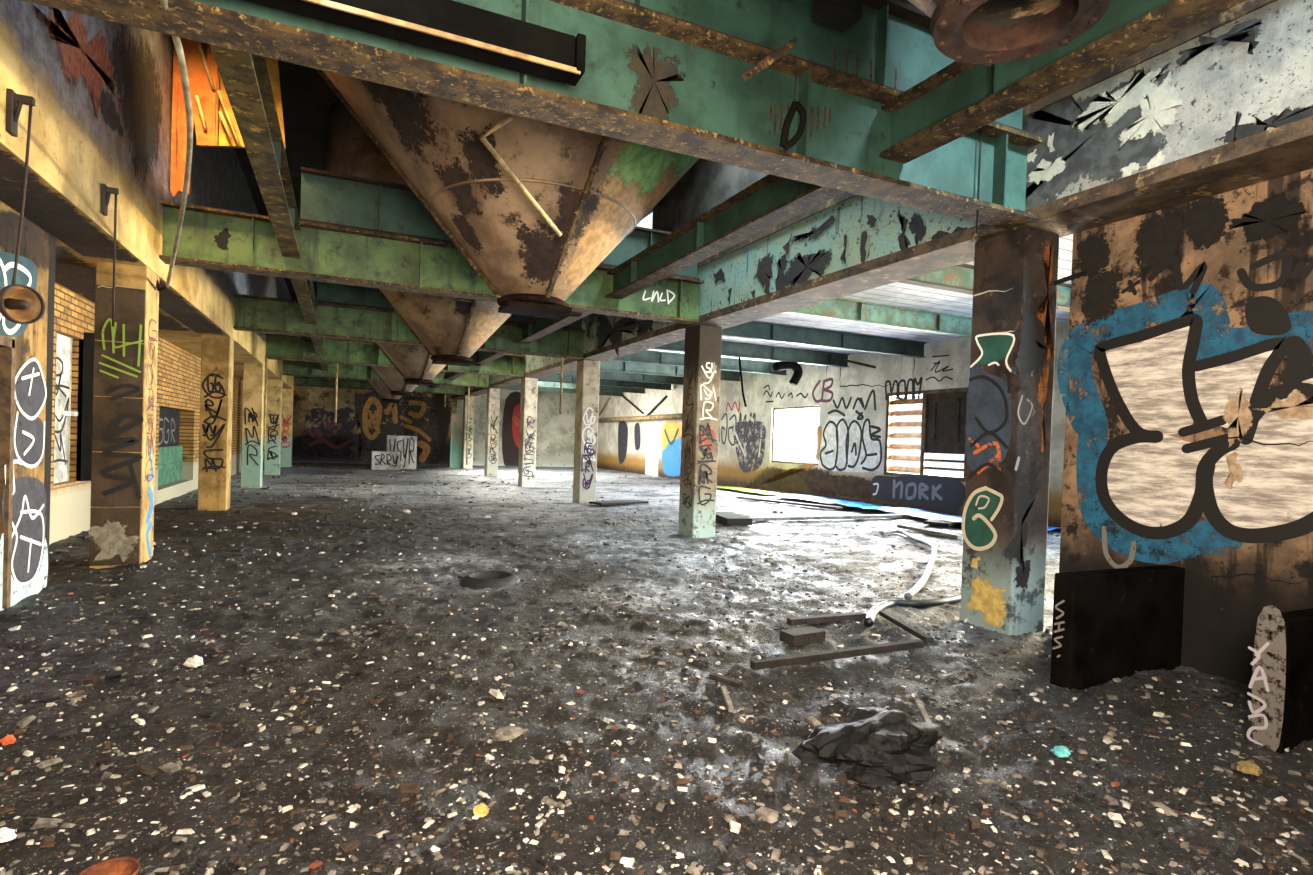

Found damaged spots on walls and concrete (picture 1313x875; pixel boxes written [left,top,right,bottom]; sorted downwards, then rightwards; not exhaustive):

peeling [1022,18,1262,210]
rust [359,79,608,286]
peeling [713,268,732,303]
peeling [751,215,877,298]
peeling [896,210,967,250]
flaking render [1229,190,1307,242]